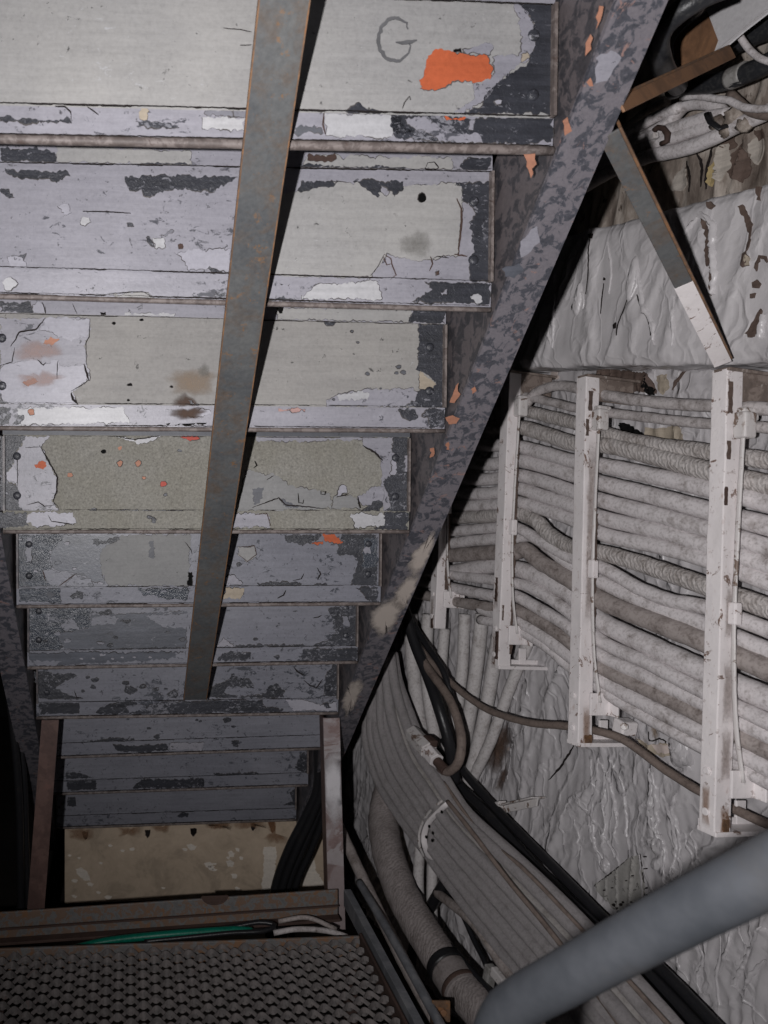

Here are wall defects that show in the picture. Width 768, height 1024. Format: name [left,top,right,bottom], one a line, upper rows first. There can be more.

peeling [585,6,621,86]
peeling [0,105,72,126]
peeling [136,108,179,130]
peeling [202,110,246,132]
peeling [294,4,572,177]
peeling [0,146,237,198]
peeling [57,203,134,227]
peeling [502,226,540,278]
corrosion [206,0,311,700]
peeling [96,153,491,747]
peeling [0,253,193,715]
peeling [88,727,204,753]